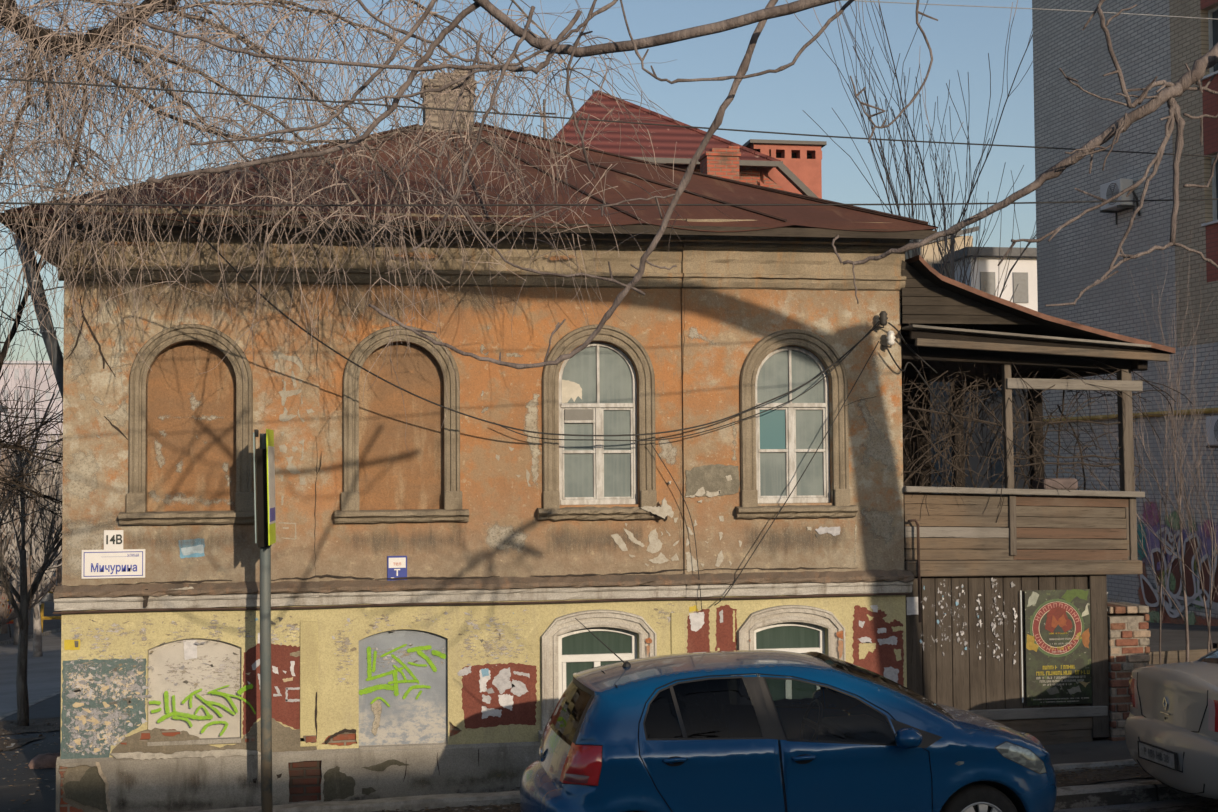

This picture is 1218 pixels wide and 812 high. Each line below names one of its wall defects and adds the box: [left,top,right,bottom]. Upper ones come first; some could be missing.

peeling [517,394,541,487]
peeling [658,438,677,465]
peeling [685,475,732,503]
peeling [611,516,732,572]
peeling [807,526,841,537]
peeling [719,610,735,642]
peeling [852,605,904,686]
peeling [61,658,154,759]
flaking render [322,728,357,746]